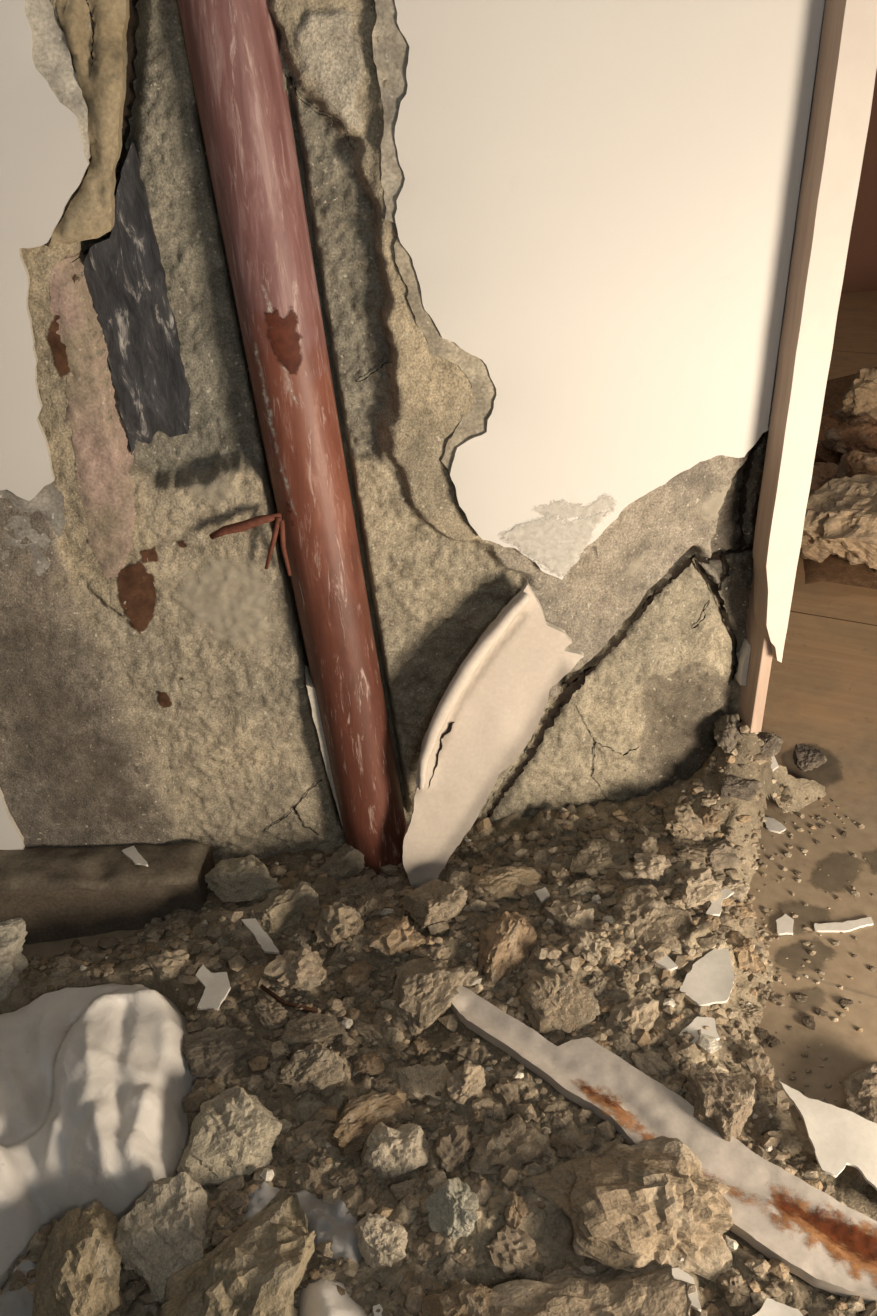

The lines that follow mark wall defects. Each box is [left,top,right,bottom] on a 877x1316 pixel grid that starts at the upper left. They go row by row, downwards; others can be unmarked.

spalling [0,0,347,862]
rust [265,310,303,374]
spalling [269,0,772,889]
crack [487,430,769,818]